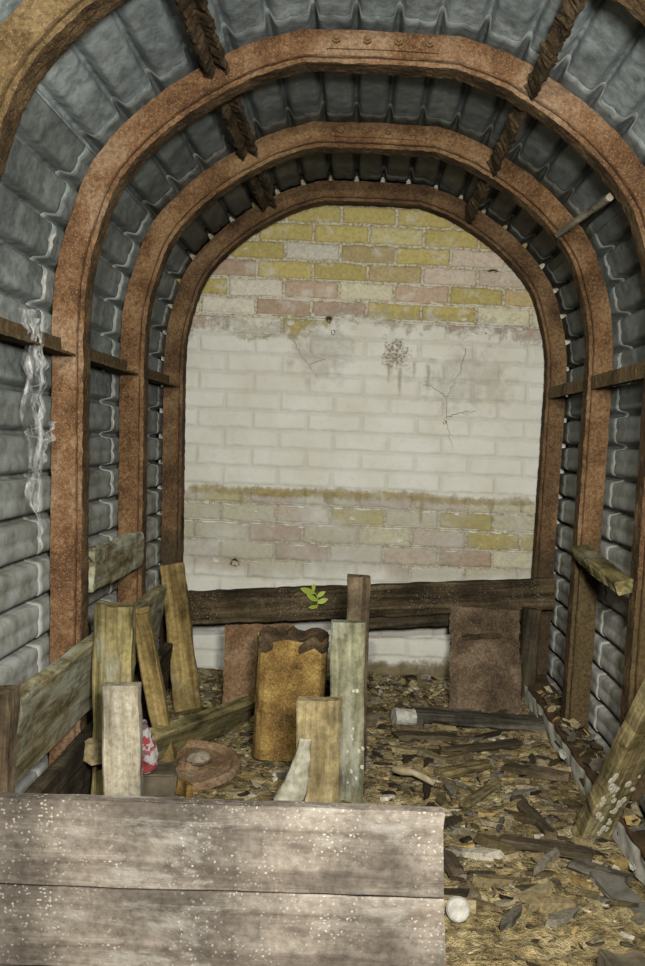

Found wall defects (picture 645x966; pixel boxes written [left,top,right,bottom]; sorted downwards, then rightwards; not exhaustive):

peeling [190,204,541,346]
peeling [184,492,536,577]